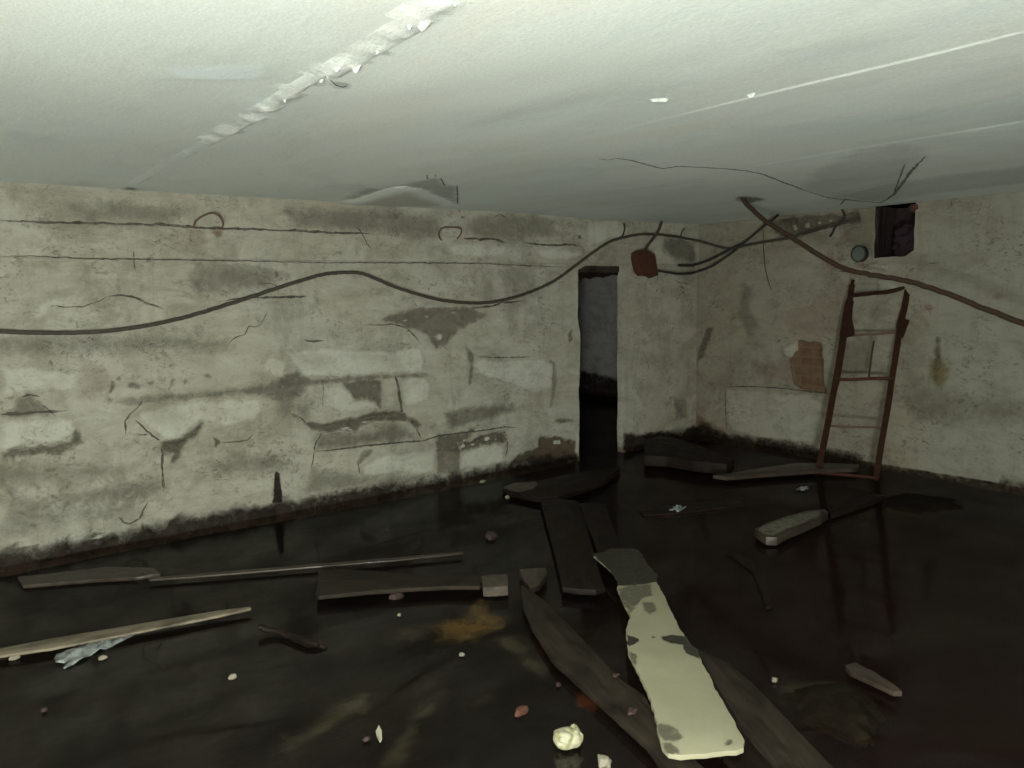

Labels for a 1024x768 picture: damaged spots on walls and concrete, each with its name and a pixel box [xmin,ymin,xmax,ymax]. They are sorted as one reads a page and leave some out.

crack [602,157,925,205]
crack [119,401,164,524]
water stain [0,407,578,577]
crack [296,376,514,473]
flaking render [724,339,827,447]
water stain [623,424,1024,496]